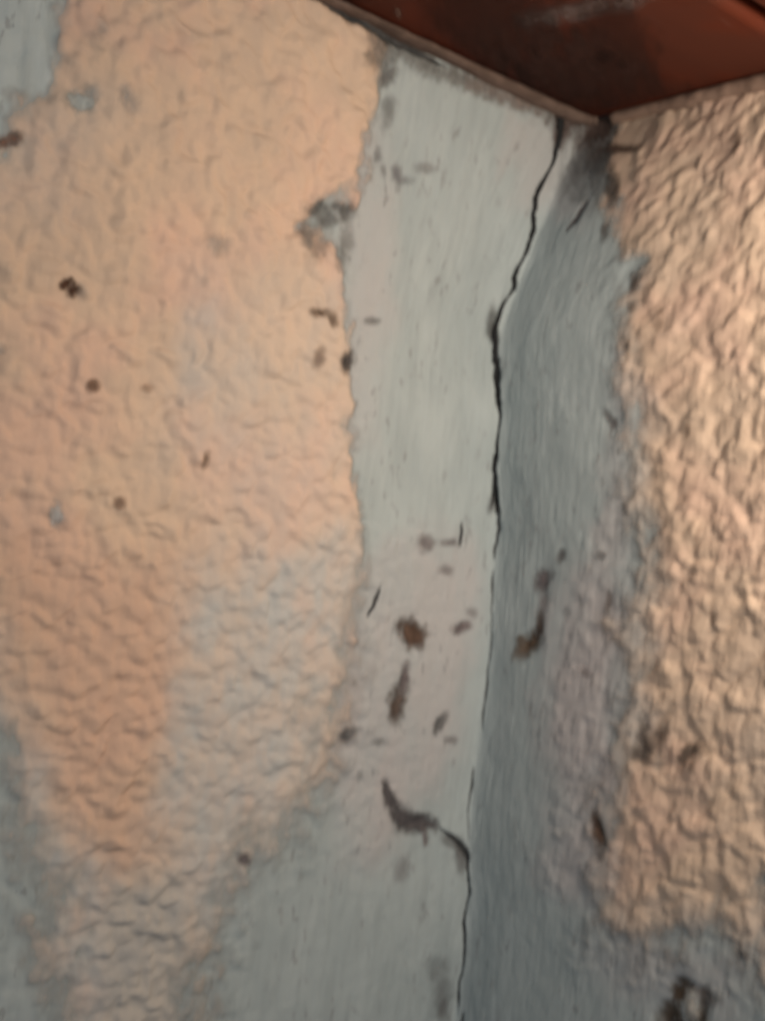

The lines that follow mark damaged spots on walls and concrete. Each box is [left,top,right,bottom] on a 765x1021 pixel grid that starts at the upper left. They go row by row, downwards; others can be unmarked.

peeling [0,0,66,157]
peeling [180,44,765,1021]
crack [482,116,564,727]
rust [515,612,543,656]
crack [441,768,474,1021]